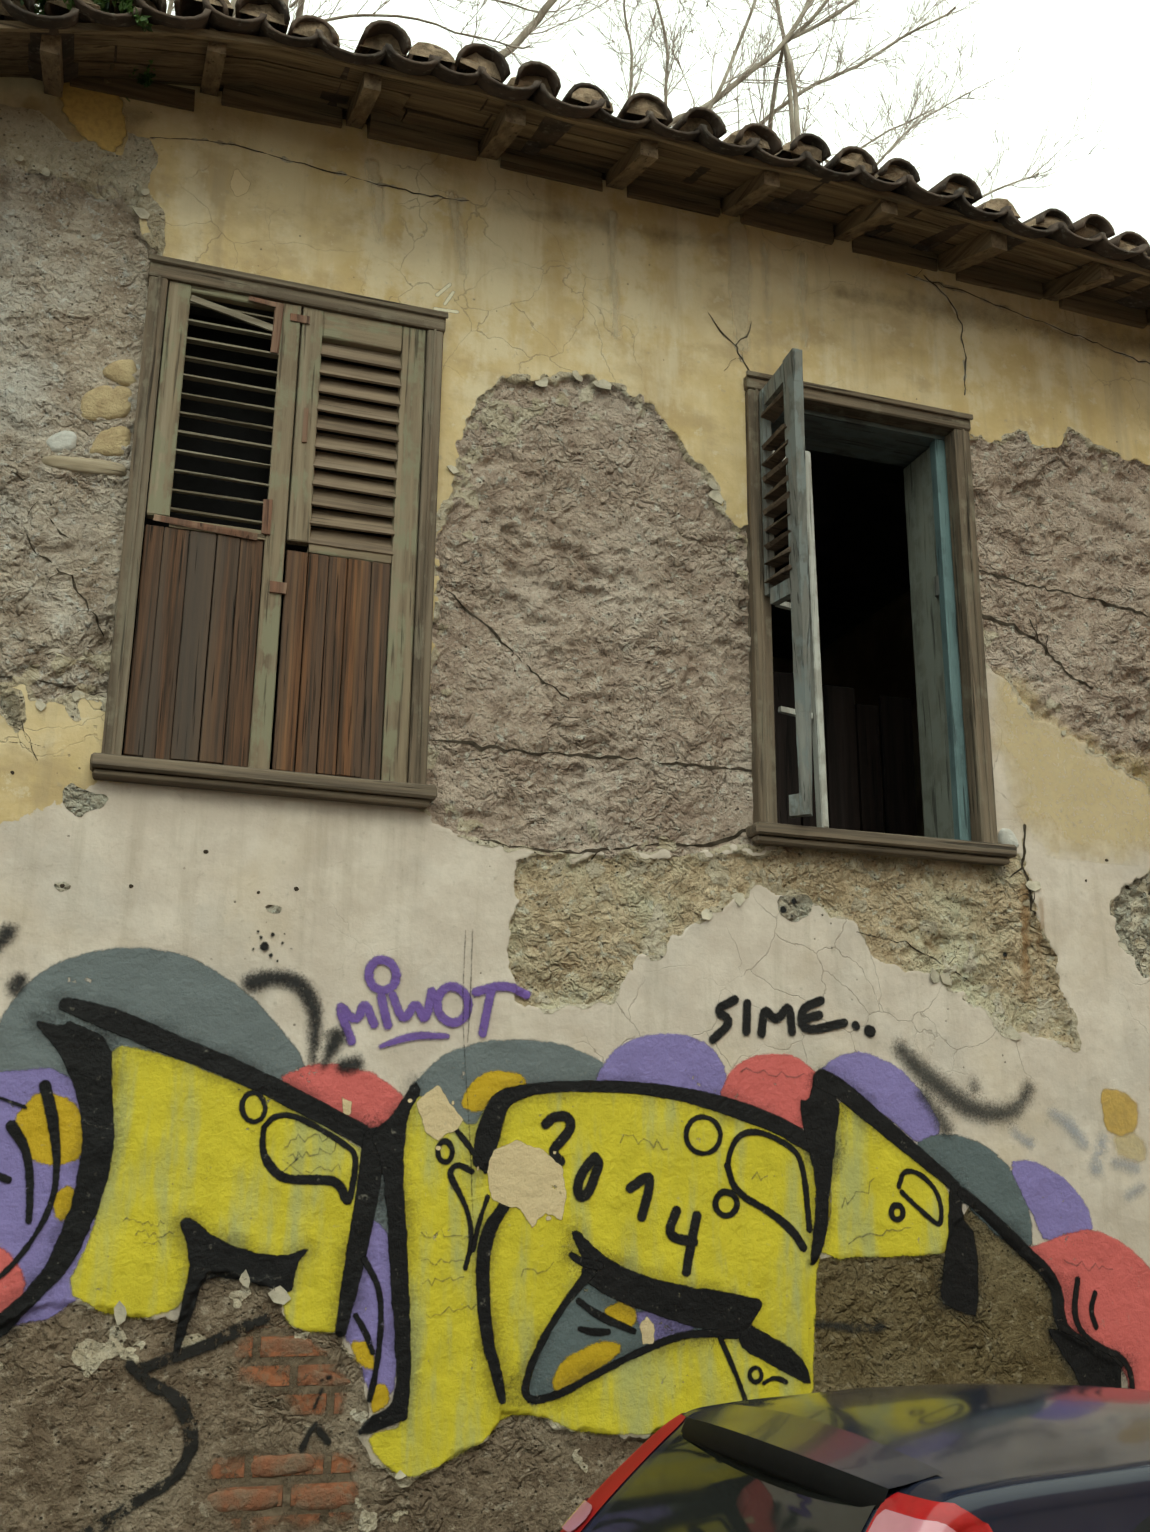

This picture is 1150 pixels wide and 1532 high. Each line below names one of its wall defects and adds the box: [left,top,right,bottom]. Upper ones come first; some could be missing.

crack [150,137,469,205]
crack [906,268,1150,395]
spalling [0,104,166,733]
crack [11,471,104,636]
crack [446,590,569,699]
spalling [969,427,1150,790]
crack [979,570,1148,690]
crack [432,738,752,772]
spalling [417,370,1082,1052]
crack [480,829,746,862]
spalling [1109,868,1150,978]
spalling [0,1270,655,1532]